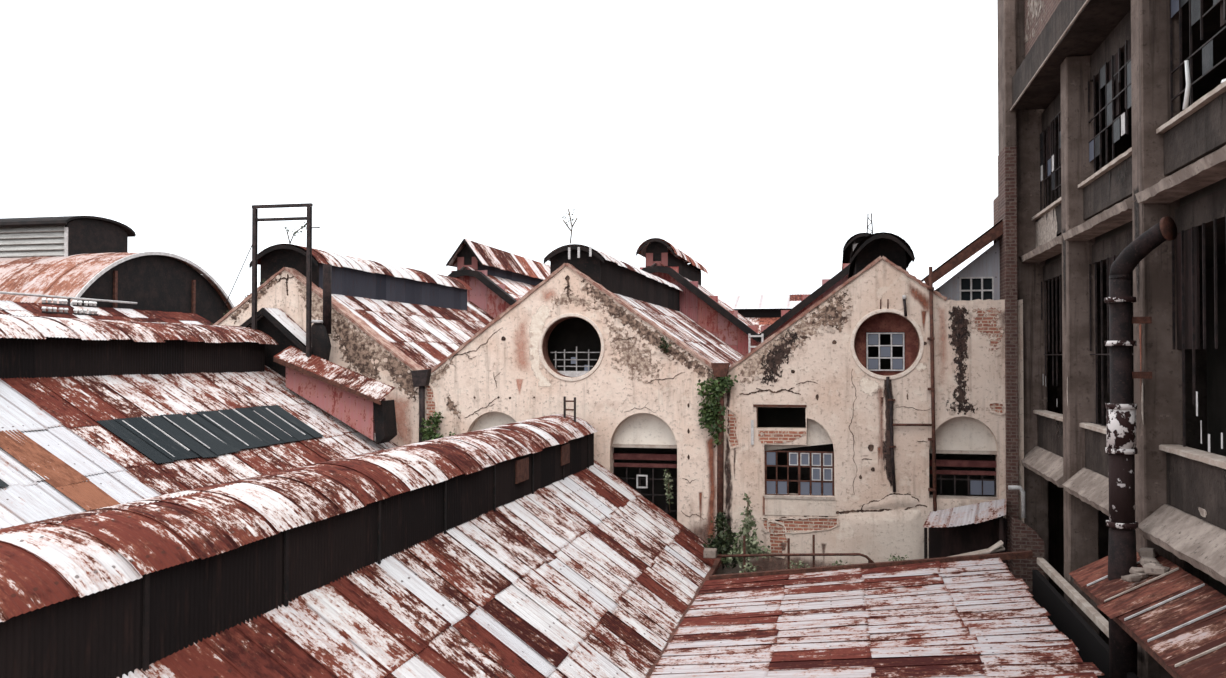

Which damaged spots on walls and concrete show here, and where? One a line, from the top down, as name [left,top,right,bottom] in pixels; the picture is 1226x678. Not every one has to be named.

mould [761,329,799,387]
damp [948,306,971,415]
flaking render [968,307,1004,357]
corrosion [0,430,120,511]
corrosion [699,437,715,538]
flaking render [760,516,839,559]